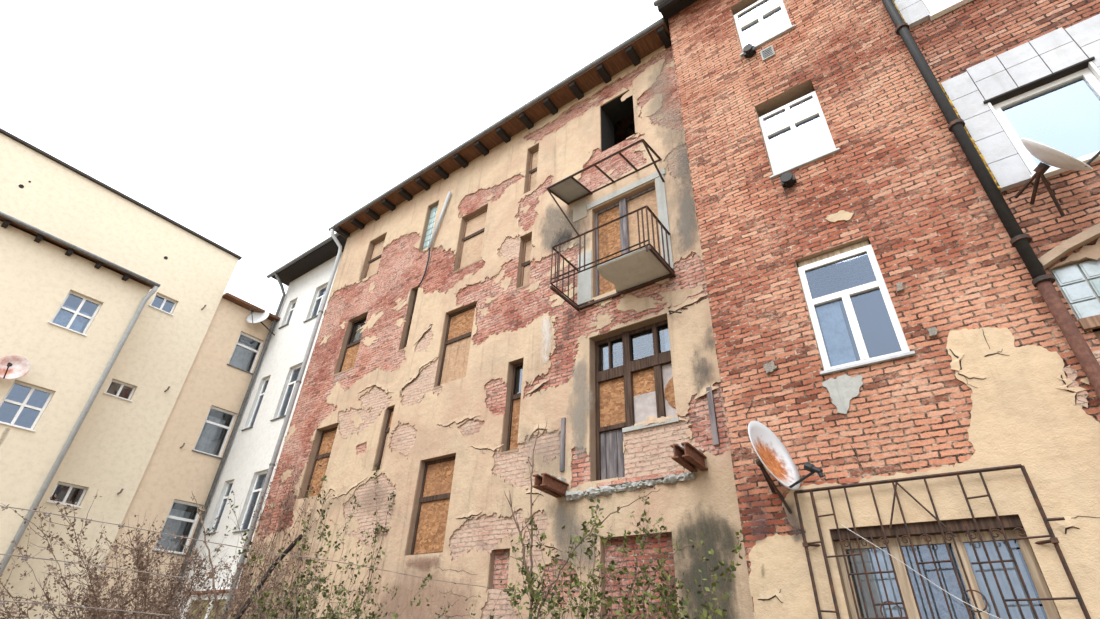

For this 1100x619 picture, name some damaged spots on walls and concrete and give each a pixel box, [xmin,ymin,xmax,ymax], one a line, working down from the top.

spalling [524,46,684,142]
spalling [578,133,647,195]
spalling [257,175,708,546]
crack [949,329,1010,388]